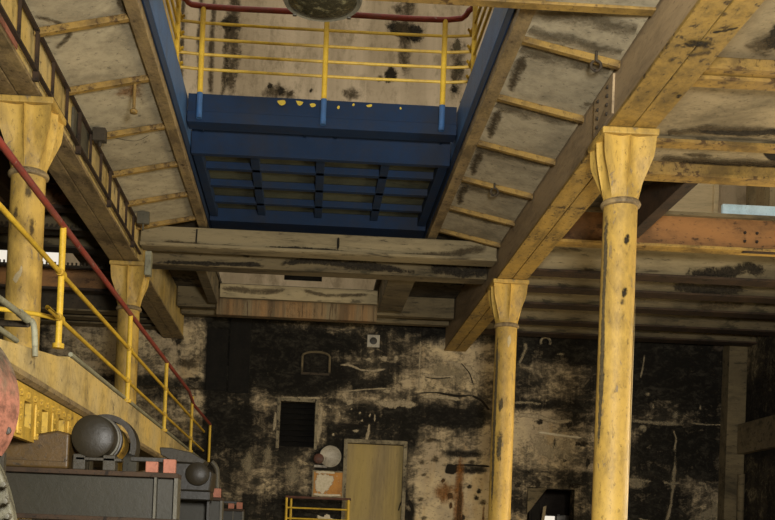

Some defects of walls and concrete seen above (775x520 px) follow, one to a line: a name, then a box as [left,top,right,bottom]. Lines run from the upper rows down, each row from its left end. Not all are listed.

leakage [208,0,241,93]
leakage [378,2,424,83]
leakage [746,26,775,52]
leakage [632,413,679,450]
rust [436,458,464,520]
leakage [664,463,679,520]